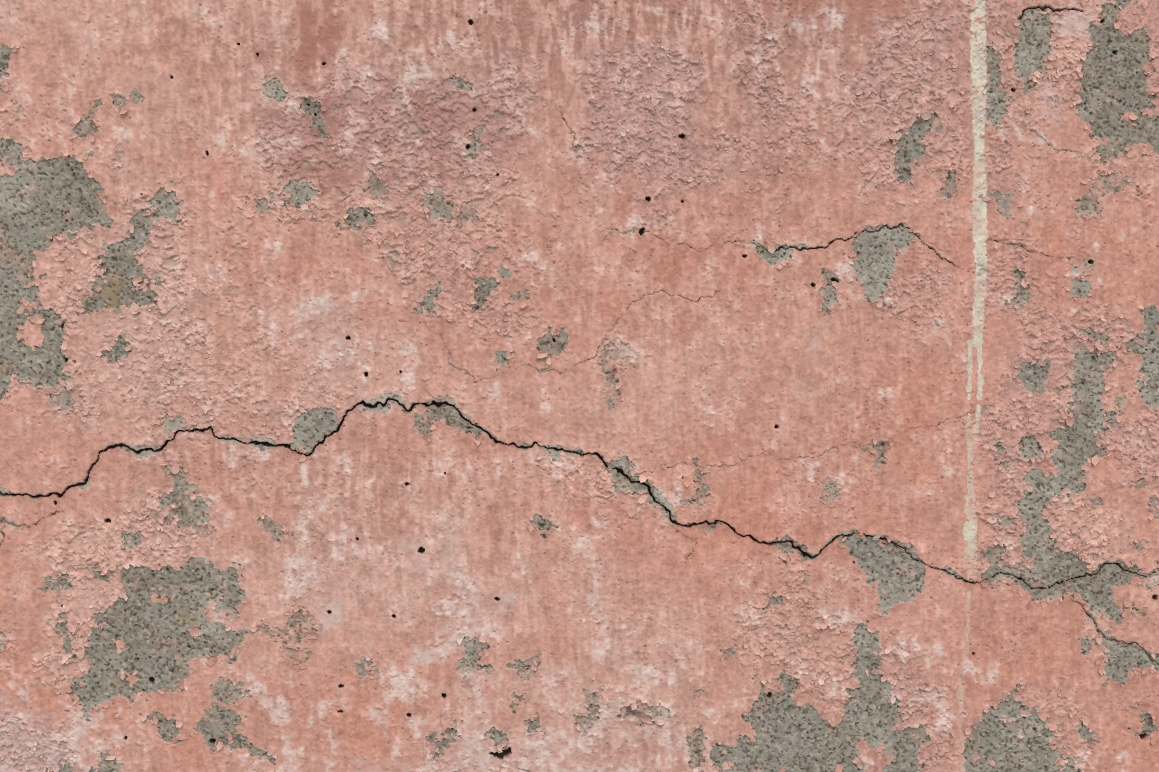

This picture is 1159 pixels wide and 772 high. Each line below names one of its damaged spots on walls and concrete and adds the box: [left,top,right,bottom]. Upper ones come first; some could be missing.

peeling [262,77,335,150]
peeling [840,0,1159,221]
crack [604,223,956,267]
peeling [819,221,954,335]
crack [0,291,1159,665]
peeling [976,237,1159,688]
peeling [0,717,73,772]
peeling [35,453,323,772]
peeling [426,720,463,762]
peeling [484,727,512,753]
peeling [456,632,545,735]
peeling [682,530,1102,772]